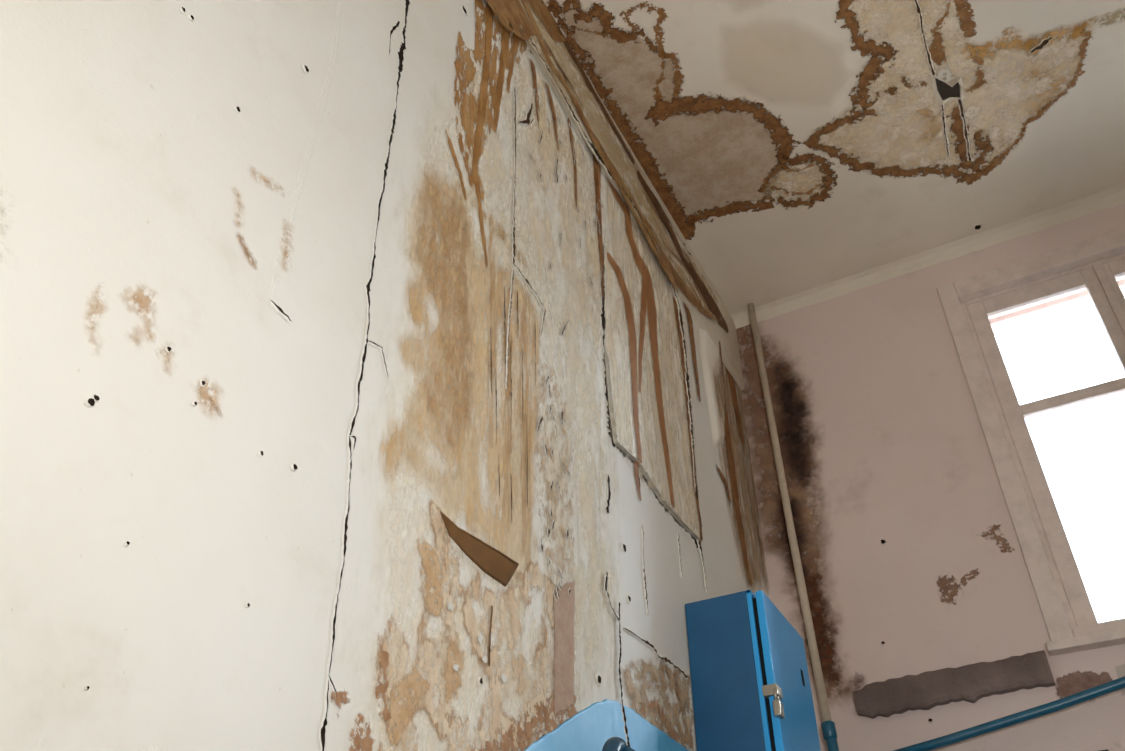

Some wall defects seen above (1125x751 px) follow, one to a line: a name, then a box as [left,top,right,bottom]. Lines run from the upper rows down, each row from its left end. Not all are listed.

crack [914,0,936,76]
crack [1029,36,1052,53]
spalling [930,69,963,105]
crack [940,99,972,161]
crack [318,0,412,751]
peeling [350,59,605,751]
water stain [446,0,1093,698]
crack [599,244,707,747]
spalling [982,524,1013,553]
spalling [937,569,980,604]
peeling [331,691,350,715]
peeling [624,660,695,748]